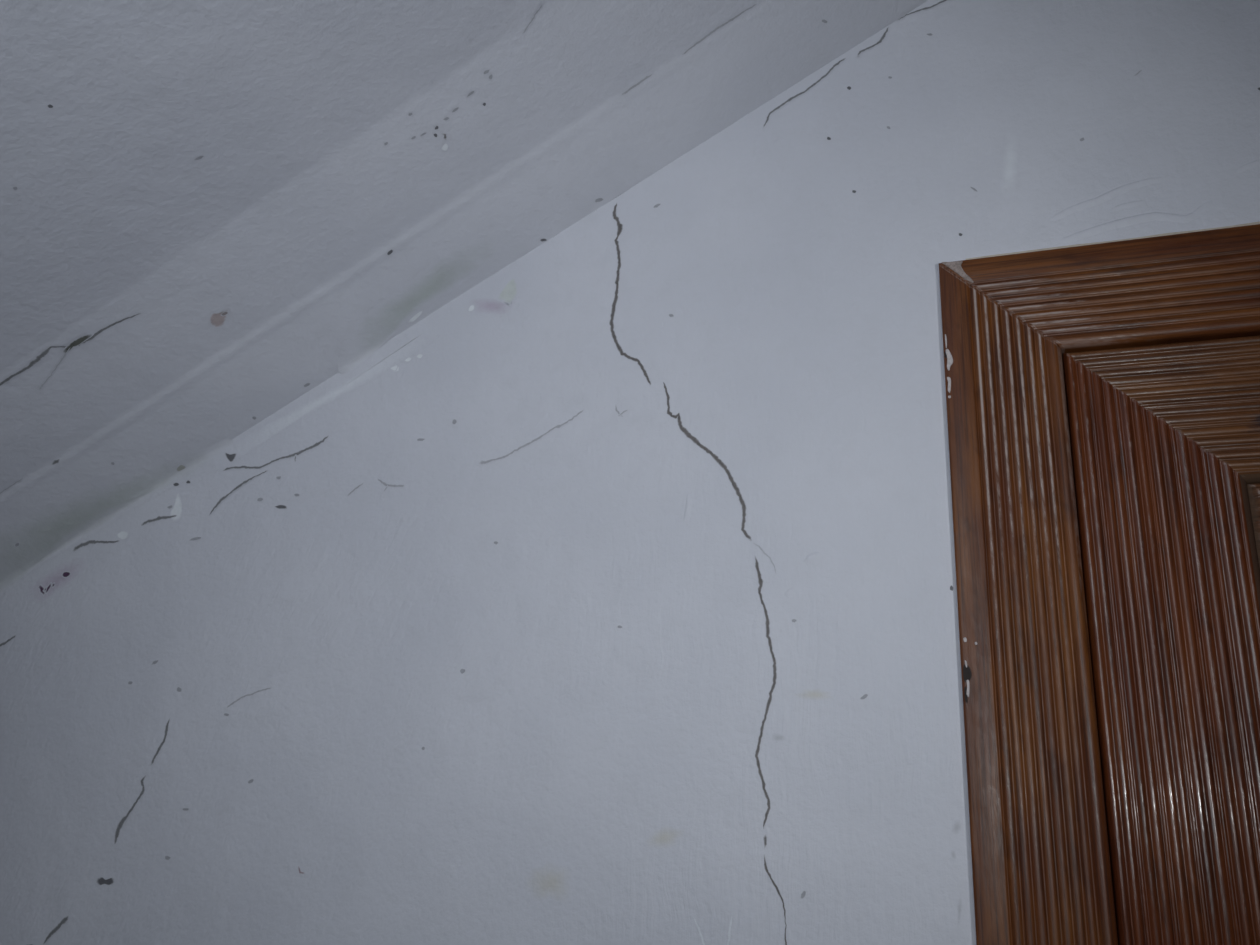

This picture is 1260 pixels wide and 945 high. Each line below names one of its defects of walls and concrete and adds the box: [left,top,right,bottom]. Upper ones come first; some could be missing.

crack [762,0,948,128]
crack [0,313,142,390]
crack [72,435,329,553]
crack [479,409,585,466]
crack [608,202,788,945]
crack [114,718,170,844]
crack [26,915,70,945]
crack [95,876,116,886]